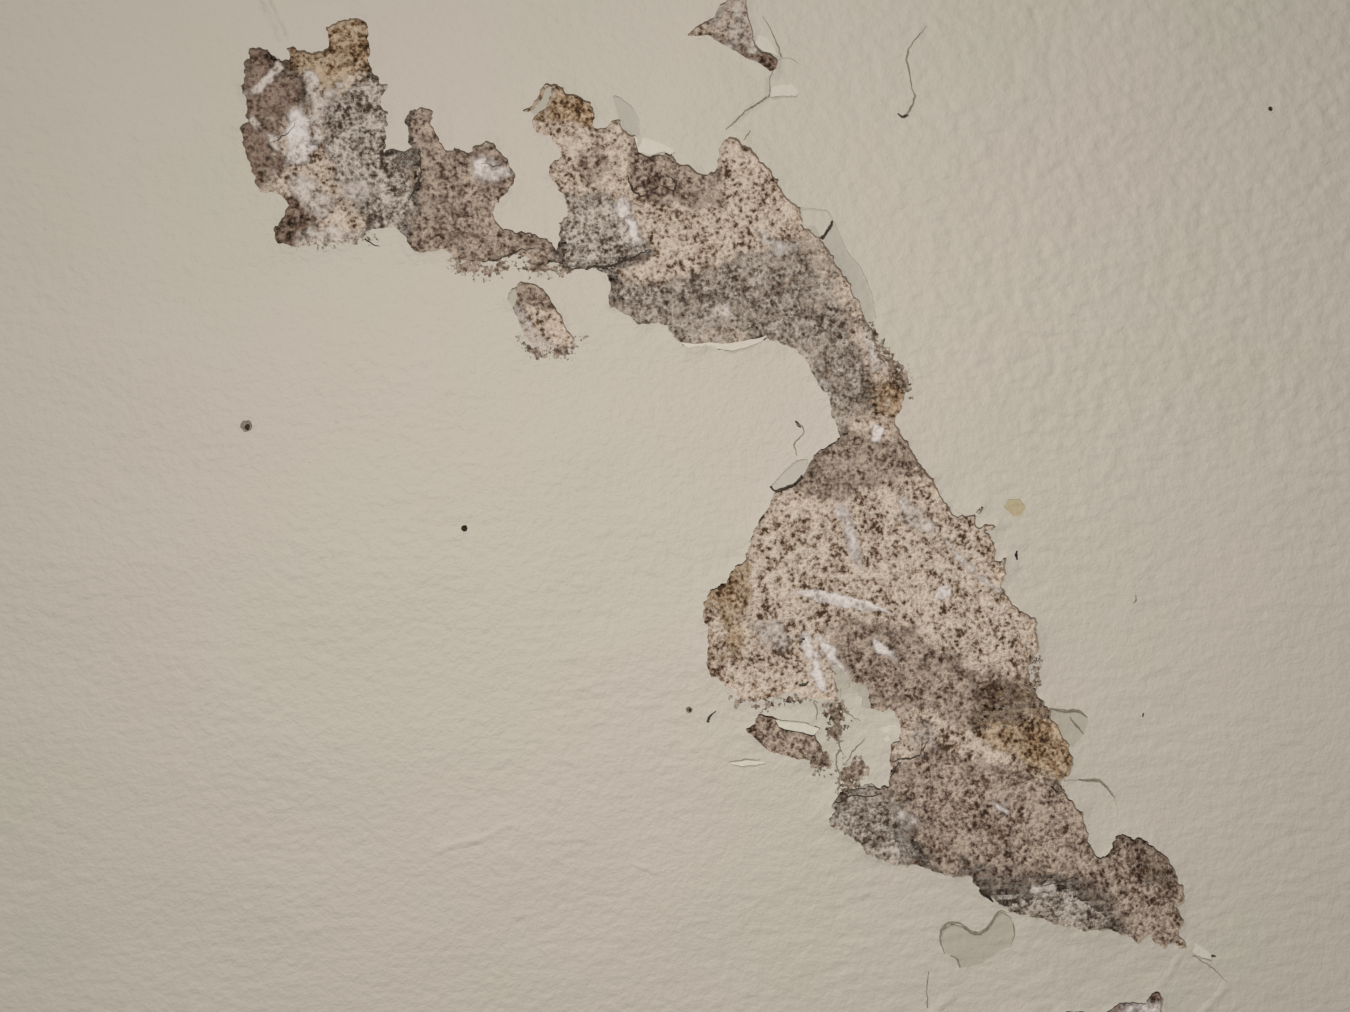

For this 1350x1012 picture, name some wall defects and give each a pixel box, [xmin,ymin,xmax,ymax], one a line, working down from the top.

peeling [241,0,1211,968]
peeling [1107,991,1161,1012]